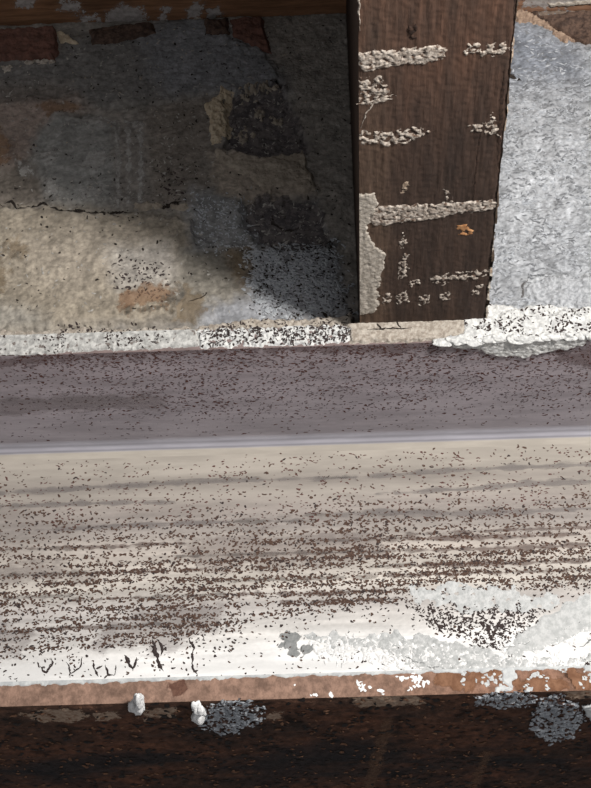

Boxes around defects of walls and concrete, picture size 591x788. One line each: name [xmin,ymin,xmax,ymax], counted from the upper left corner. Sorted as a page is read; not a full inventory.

flaking render [0,22,161,75]
flaking render [204,16,272,54]
flaking render [186,65,317,158]
crack [1,200,130,216]